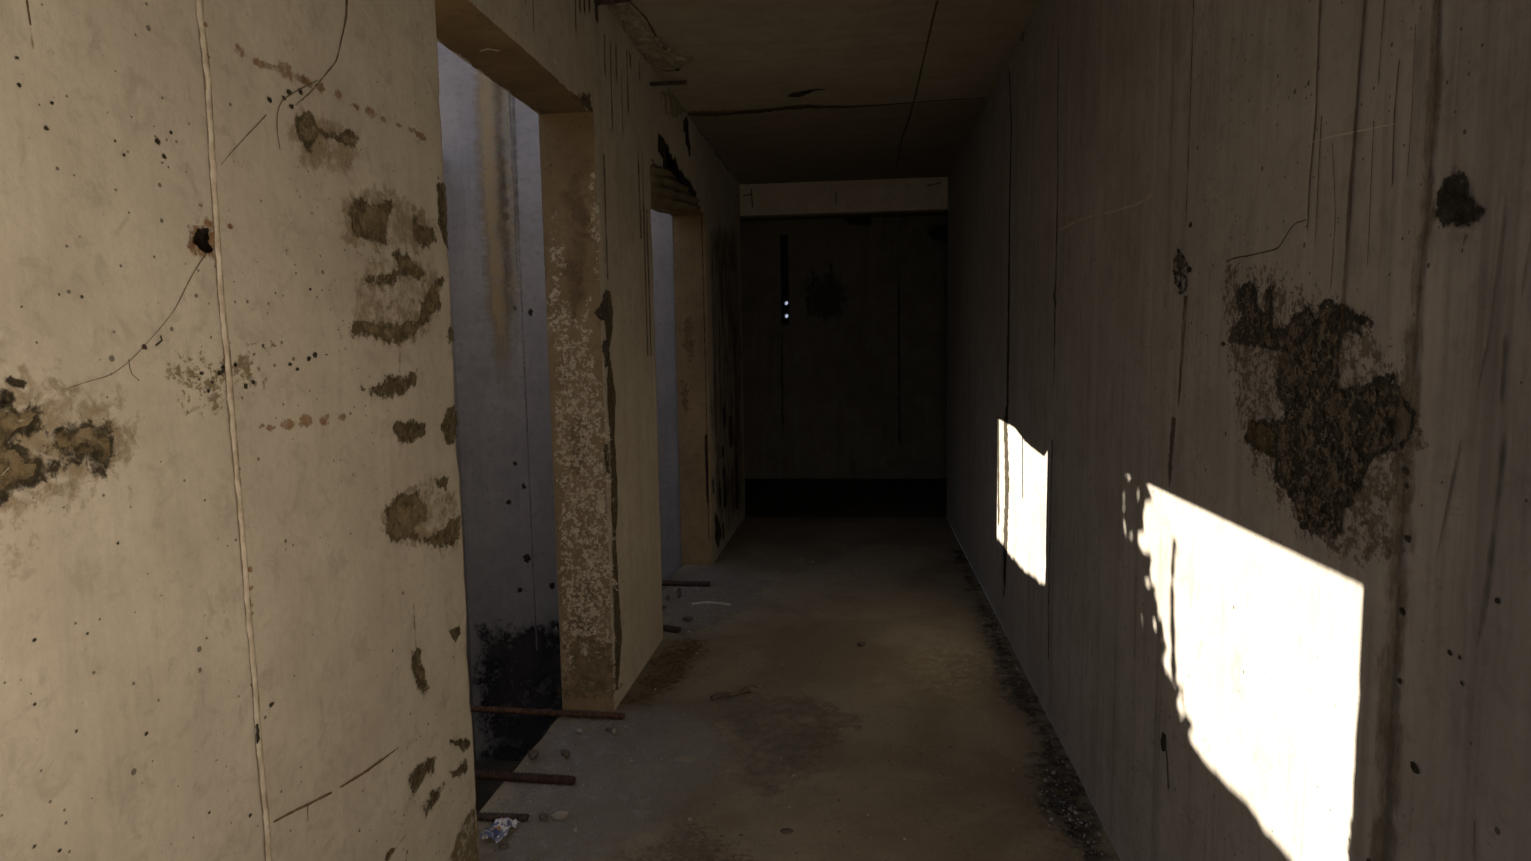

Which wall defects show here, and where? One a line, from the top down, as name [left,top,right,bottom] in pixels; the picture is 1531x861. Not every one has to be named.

spalling [292,110,359,167]
spalling [1434,167,1484,253]
spalling [343,183,449,400]
spalling [0,376,127,507]
spalling [1221,264,1427,570]
spalling [382,476,461,549]